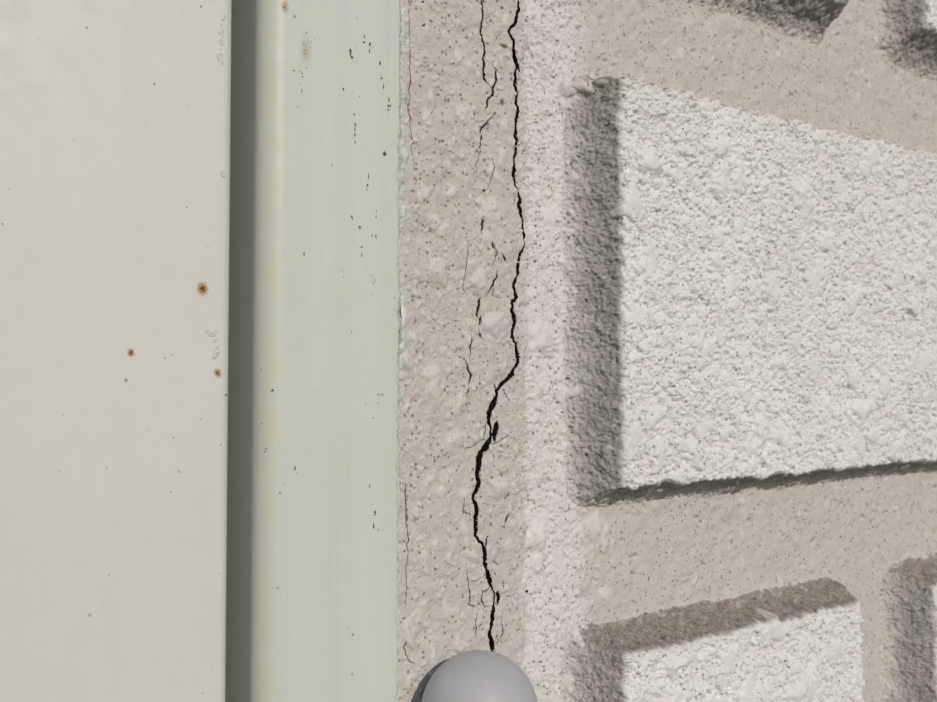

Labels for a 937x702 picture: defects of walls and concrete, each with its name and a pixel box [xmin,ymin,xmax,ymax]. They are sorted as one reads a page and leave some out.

crack [462,0,526,652]